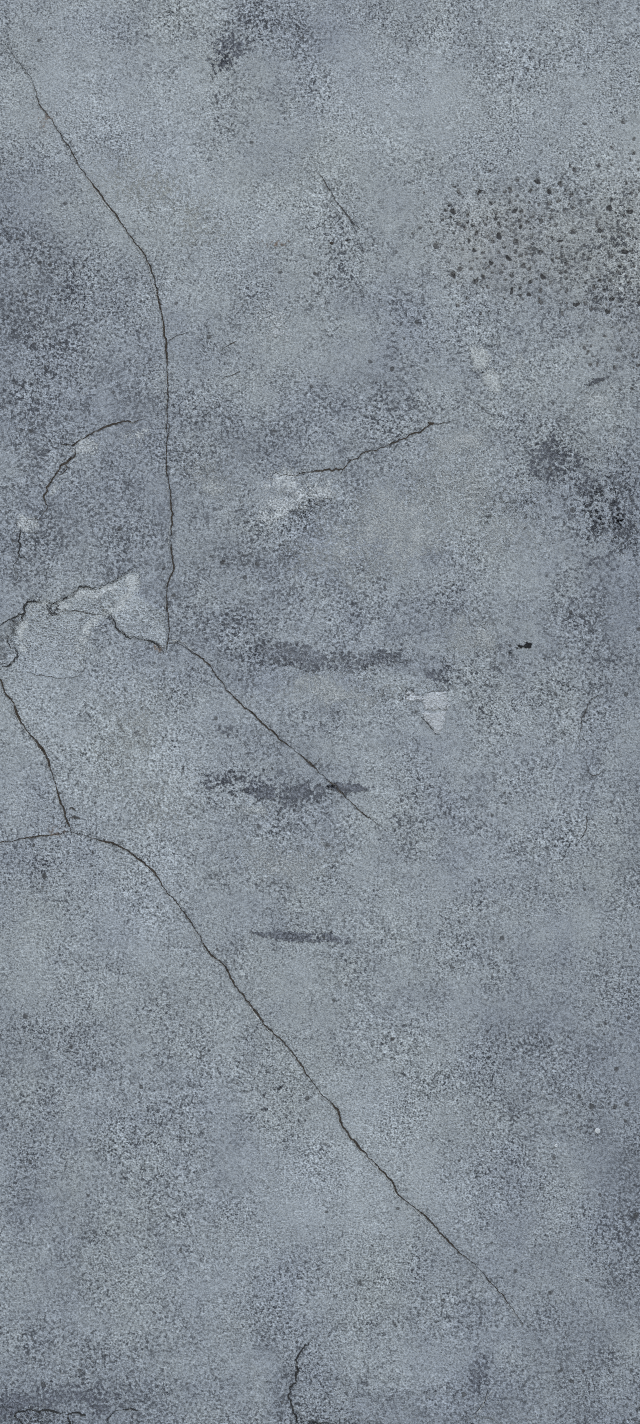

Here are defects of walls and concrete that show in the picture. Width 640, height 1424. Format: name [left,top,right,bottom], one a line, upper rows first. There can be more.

crack [0,39,398,840]
crack [276,419,458,476]
crack [0,679,523,1324]